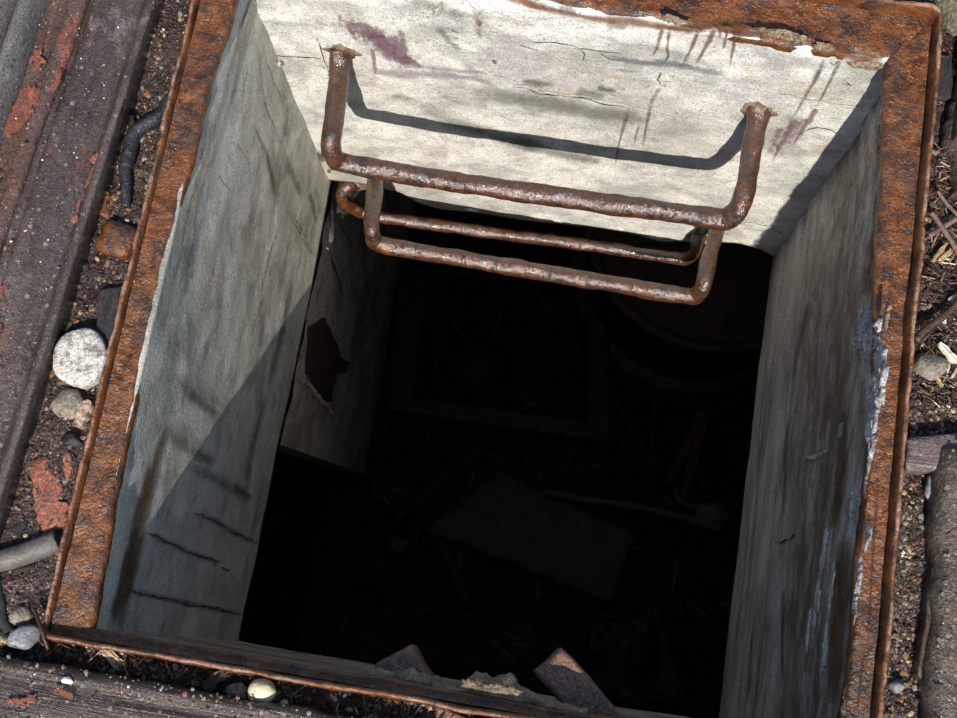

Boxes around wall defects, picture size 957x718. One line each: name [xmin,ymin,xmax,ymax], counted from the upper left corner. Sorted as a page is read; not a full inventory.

corrosion [338,17,420,72]
crack [532,42,622,62]
corrosion [510,0,749,61]
peeling [4,69,61,138]
crack [513,85,671,118]
corrosion [771,109,817,156]
spalling [305,317,349,402]
spalling [848,299,892,519]
corrosion [114,440,163,615]
spalling [805,523,836,674]
corrosion [827,441,878,718]
spalling [852,523,873,624]